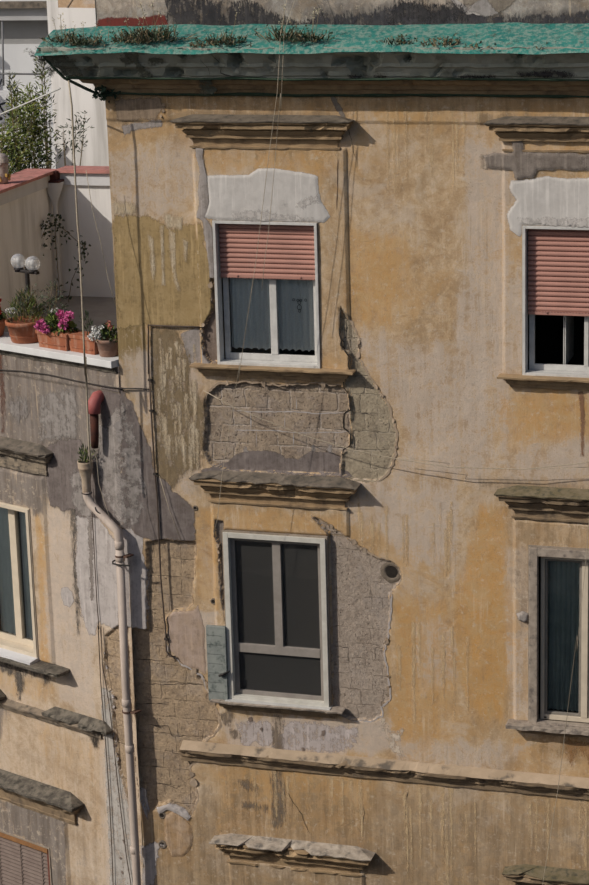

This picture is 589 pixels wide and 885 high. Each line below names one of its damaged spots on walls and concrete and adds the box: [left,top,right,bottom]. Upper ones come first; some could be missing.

leakage [164,0,589,26]
spalling [452,0,515,16]
spalling [112,198,398,489]
spalling [103,539,221,819]
spalling [236,517,401,753]